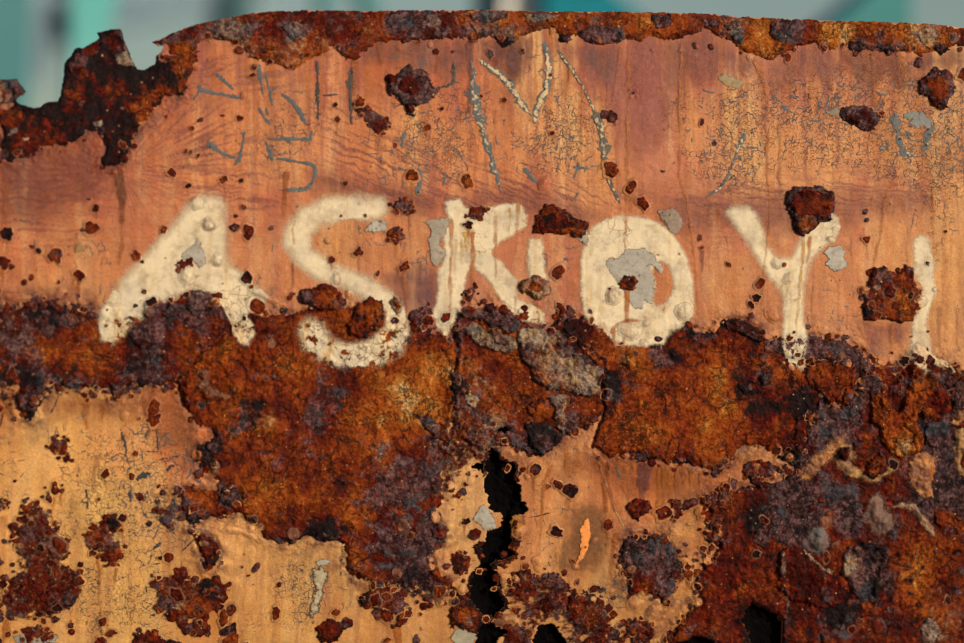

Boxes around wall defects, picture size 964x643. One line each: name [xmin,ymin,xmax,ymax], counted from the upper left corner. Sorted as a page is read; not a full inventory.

rust [382,167,429,245]
peeling [425,217,448,266]
crack [352,43,607,186]
rust [0,9,964,213]
peeling [606,247,664,309]
crack [685,80,964,234]
rust [0,193,964,643]
crack [0,411,224,576]
peeling [472,504,496,531]